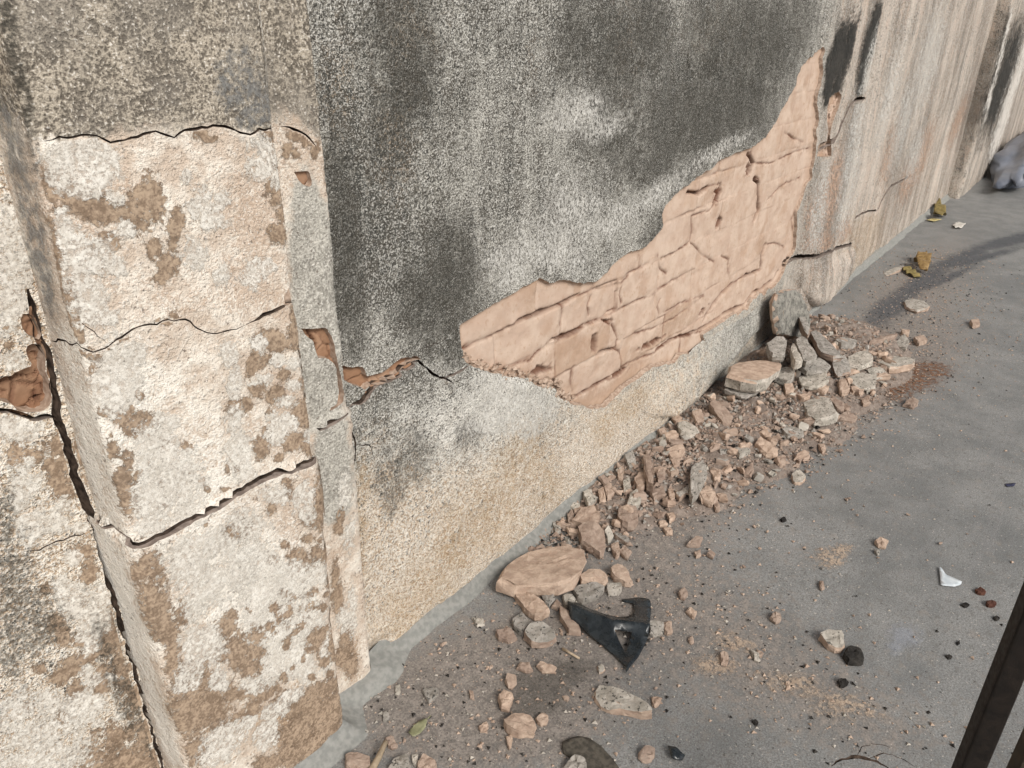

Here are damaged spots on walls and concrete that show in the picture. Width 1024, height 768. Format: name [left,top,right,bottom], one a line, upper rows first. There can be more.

crack [43,124,316,146]
damp [324,158,362,359]
damp [372,0,435,173]
damp [400,0,811,365]
flaking render [460,47,854,409]
crack [819,96,865,151]
crack [782,176,908,265]
damp [808,1,884,251]
damp [976,9,1024,150]
peeling [0,176,165,768]
crack [0,289,316,768]
peeling [38,4,420,768]